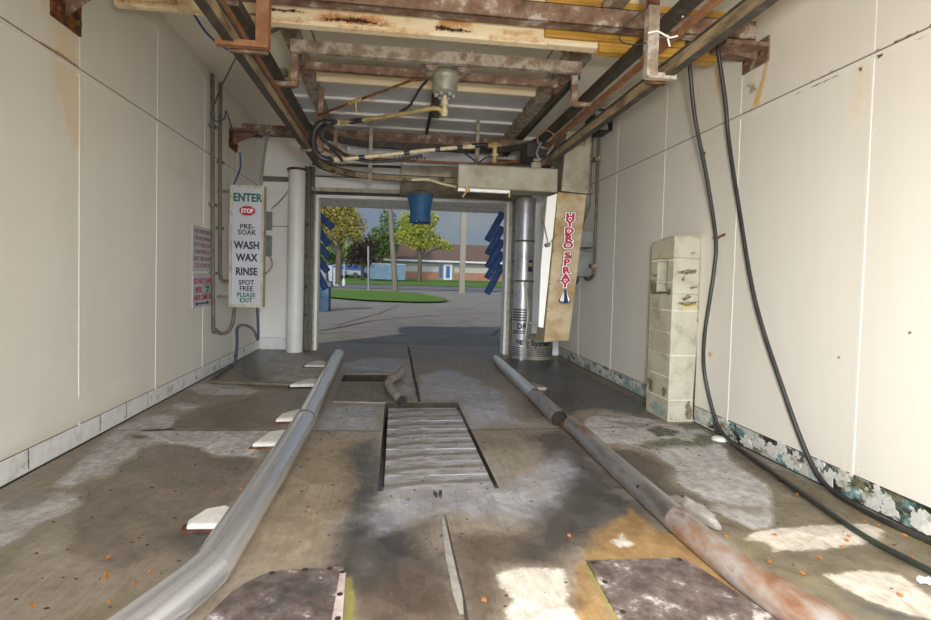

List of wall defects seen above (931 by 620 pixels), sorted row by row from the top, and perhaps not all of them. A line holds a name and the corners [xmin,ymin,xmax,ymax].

damp [0,350,324,567]
damp [262,442,355,563]
peeling [698,415,931,538]